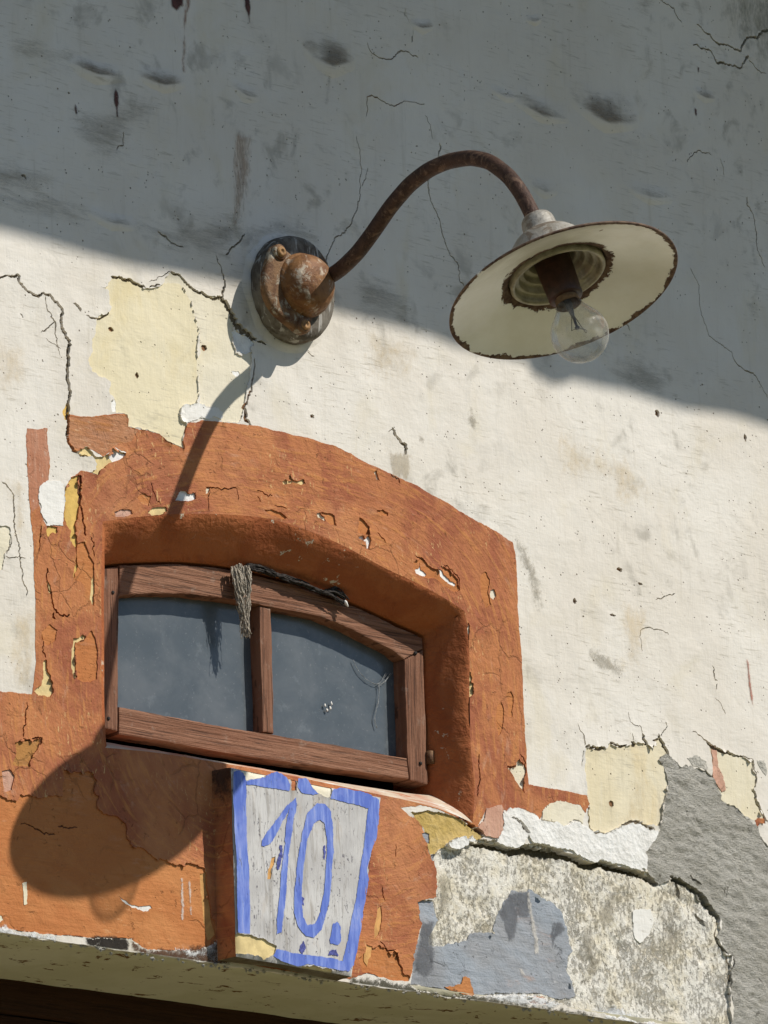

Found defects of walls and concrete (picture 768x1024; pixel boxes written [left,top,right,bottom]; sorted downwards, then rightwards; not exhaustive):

crack [693,29,768,69]
crack [111,272,266,345]
peeling [62,272,253,475]
peeling [26,428,94,605]
peeling [35,660,54,697]
peeling [71,631,97,682]
flaking render [359,738,731,1024]
crack [470,818,679,885]
crack [713,929,730,995]